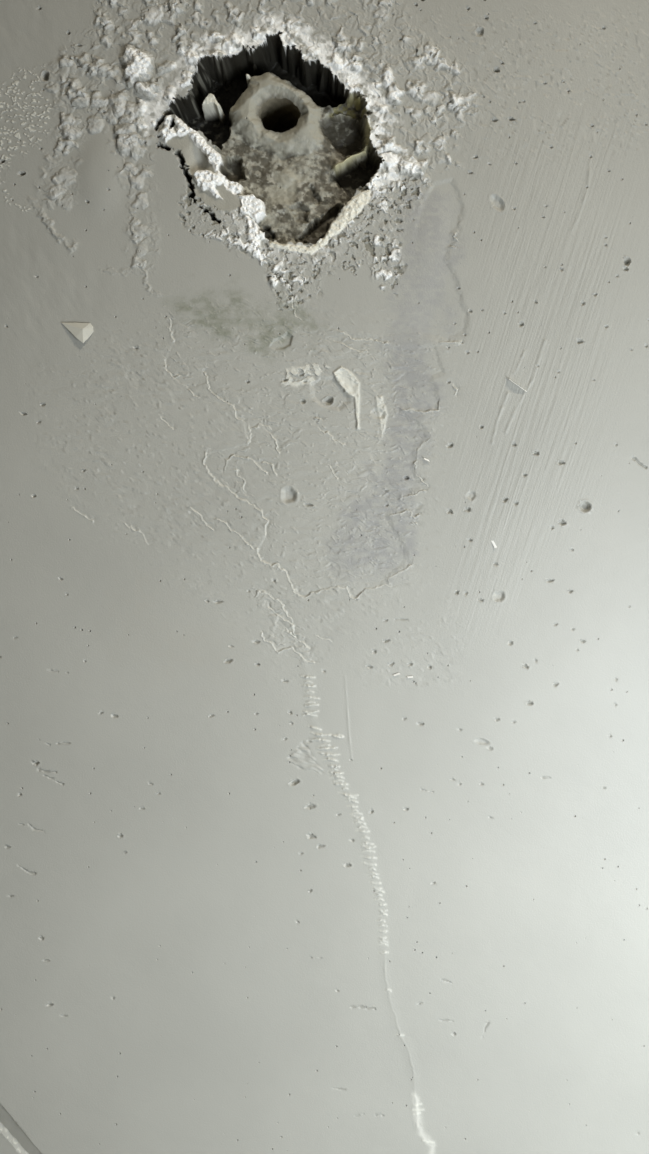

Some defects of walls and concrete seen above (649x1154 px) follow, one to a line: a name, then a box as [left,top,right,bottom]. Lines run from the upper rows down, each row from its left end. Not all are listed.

spalling [155,31,385,266]
crack [295,640,439,1154]